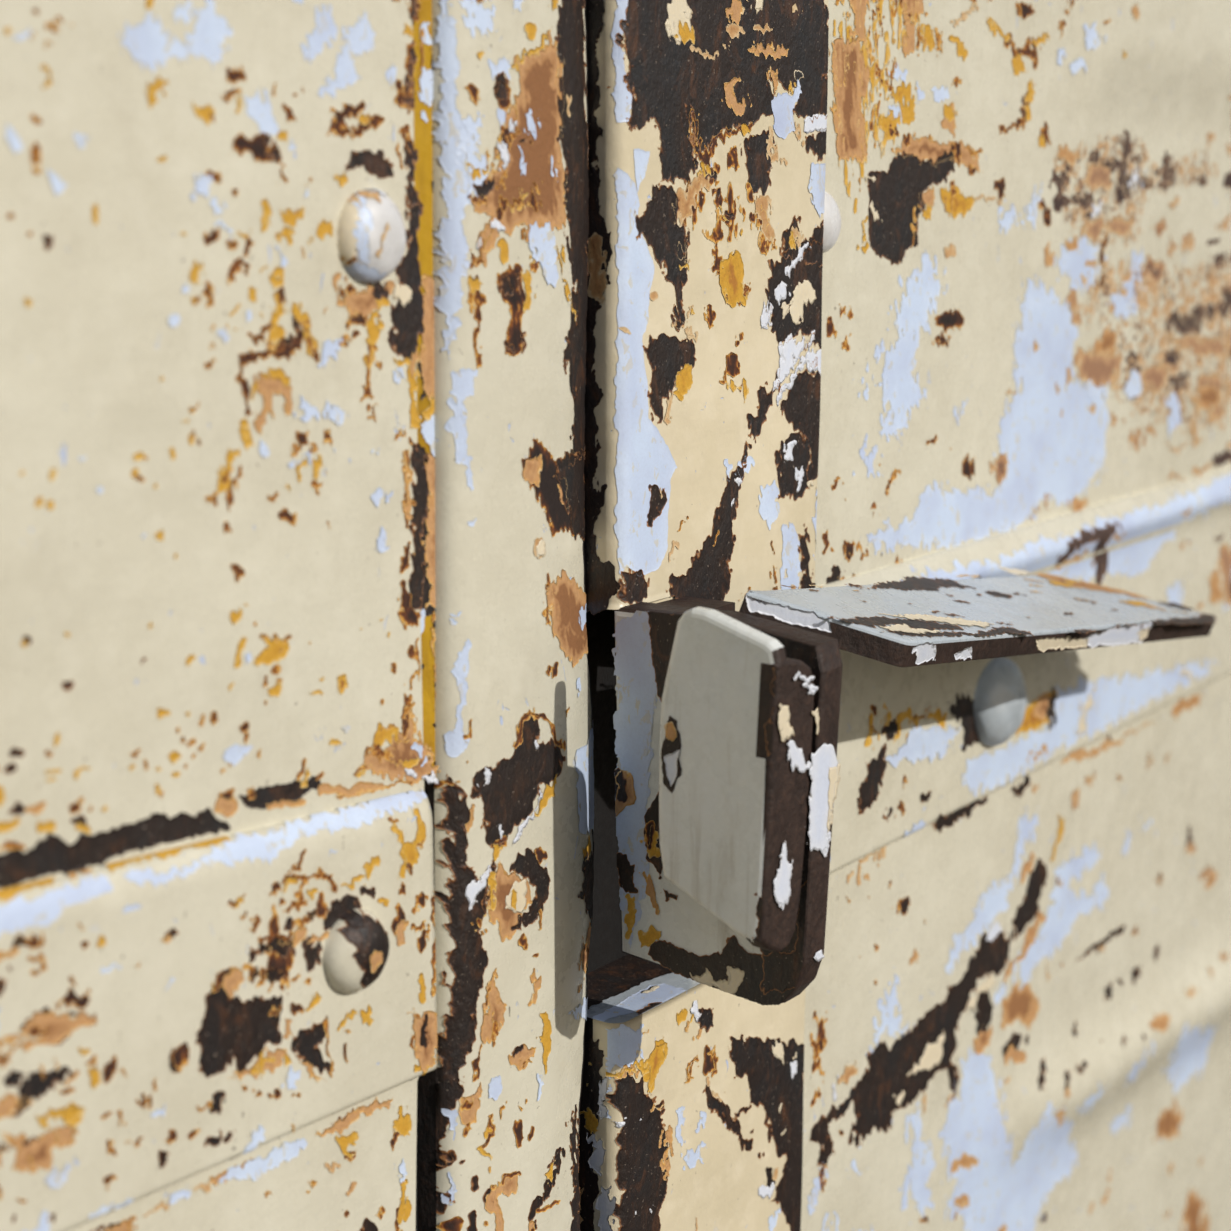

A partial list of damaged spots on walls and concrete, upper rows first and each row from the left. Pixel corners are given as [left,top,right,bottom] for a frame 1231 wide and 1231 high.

peeling [293,0,511,739]
rust [465,0,621,615]
peeling [522,438,585,540]
peeling [542,569,588,668]
rust [636,108,777,340]
peeling [587,0,1231,1231]
peeling [89,1097,393,1231]
peeling [0,707,566,1171]
rust [212,807,438,1076]
rust [436,968,552,1231]
rust [528,1039,616,1231]
rust [1001,981,1047,1090]